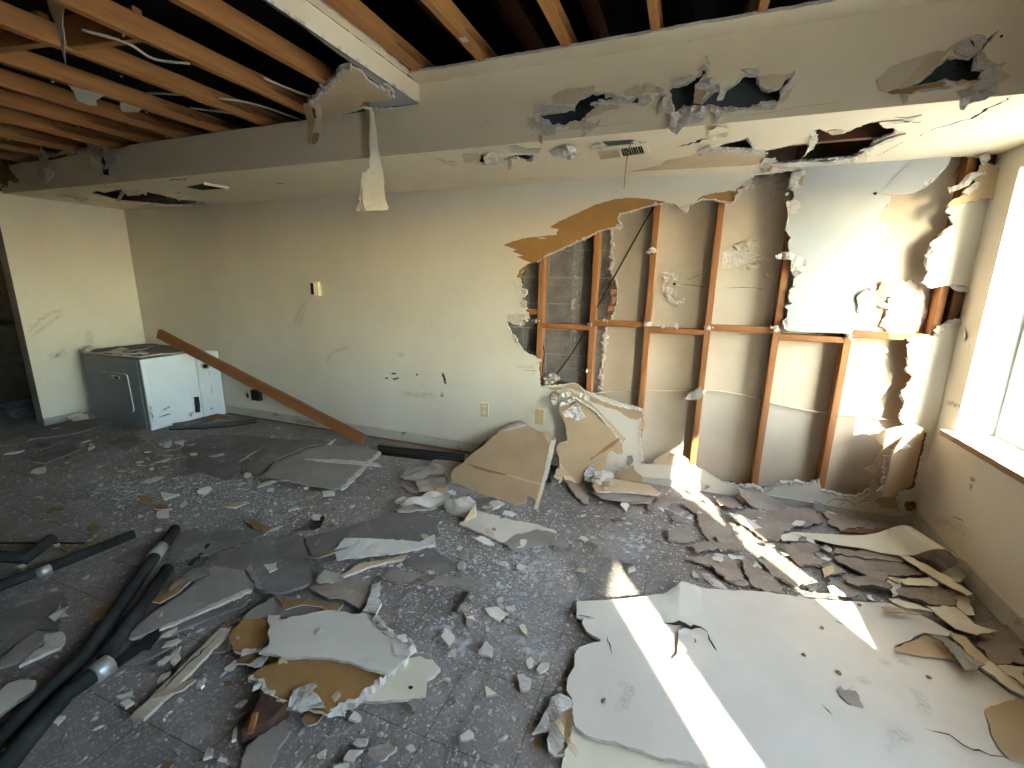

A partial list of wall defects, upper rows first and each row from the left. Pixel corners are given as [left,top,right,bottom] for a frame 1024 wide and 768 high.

spalling [307,62,352,108]
peeling [432,55,778,166]
peeling [741,67,788,90]
peeling [876,34,1011,110]
peeling [101,156,147,201]
spalling [716,115,922,330]
spalling [506,200,701,445]
spalling [674,216,970,511]